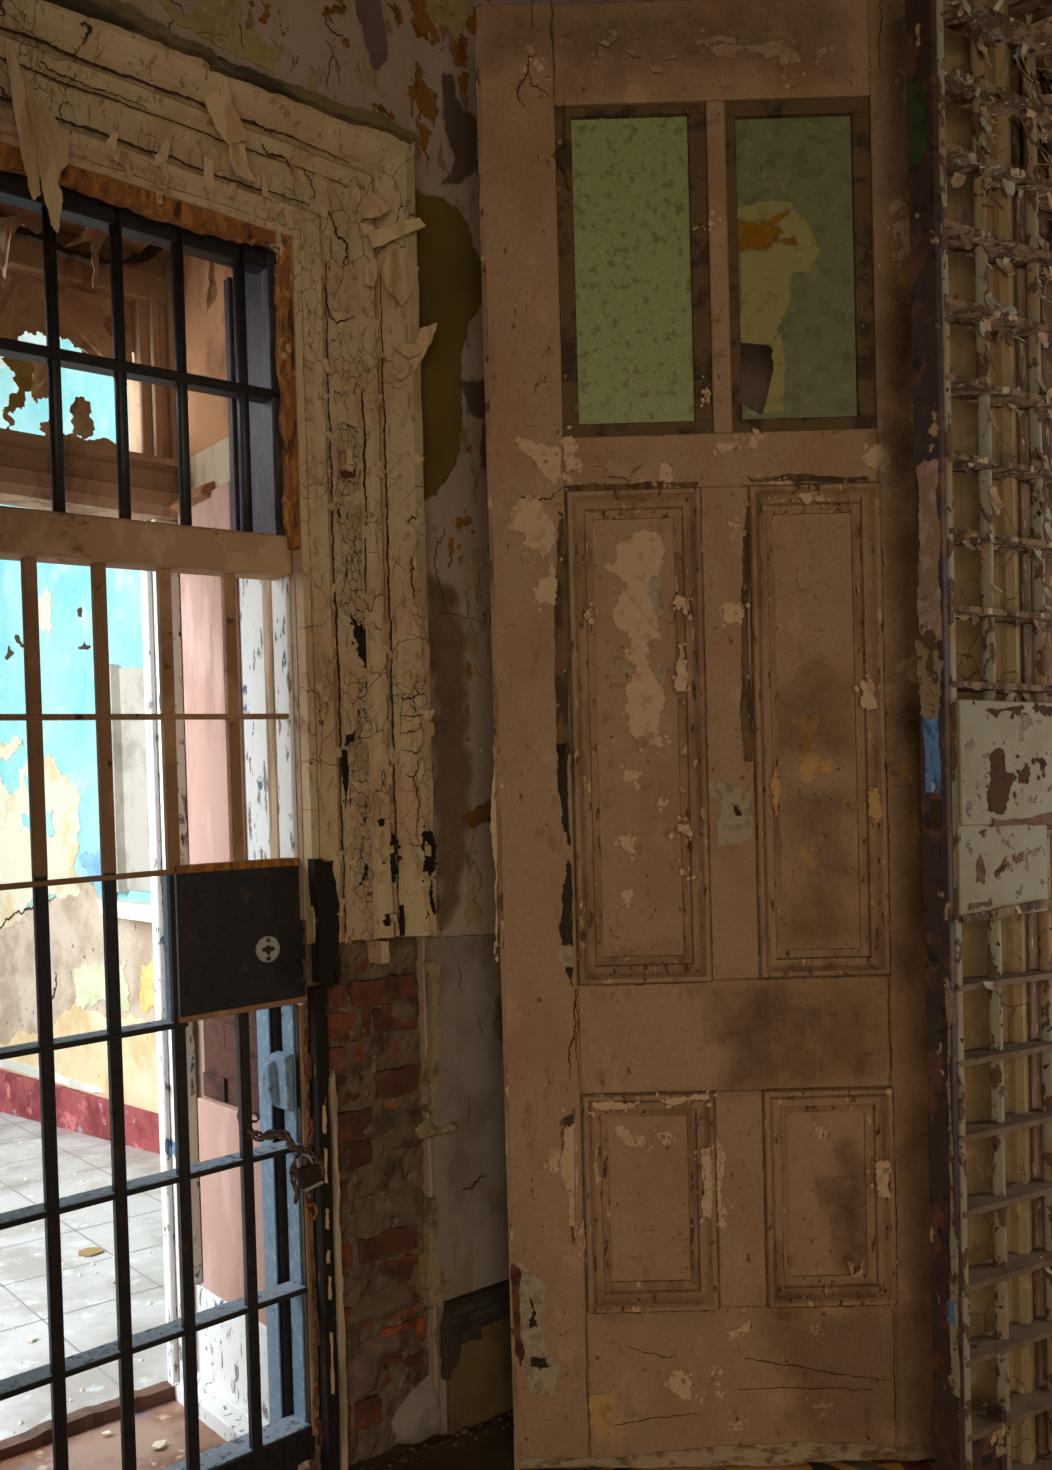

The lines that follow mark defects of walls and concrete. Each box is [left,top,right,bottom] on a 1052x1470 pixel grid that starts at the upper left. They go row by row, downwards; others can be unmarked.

peeling [684,27,834,97]
peeling [1,357,48,430]
peeling [0,36,134,385]
peeling [39,396,116,449]
peeling [204,261,217,317]
crack [0,0,481,933]
peeling [202,77,328,291]
peeling [305,412,424,511]
peeling [358,172,437,404]
flaking render [0,735,156,1045]
flaking render [302,579,483,1470]